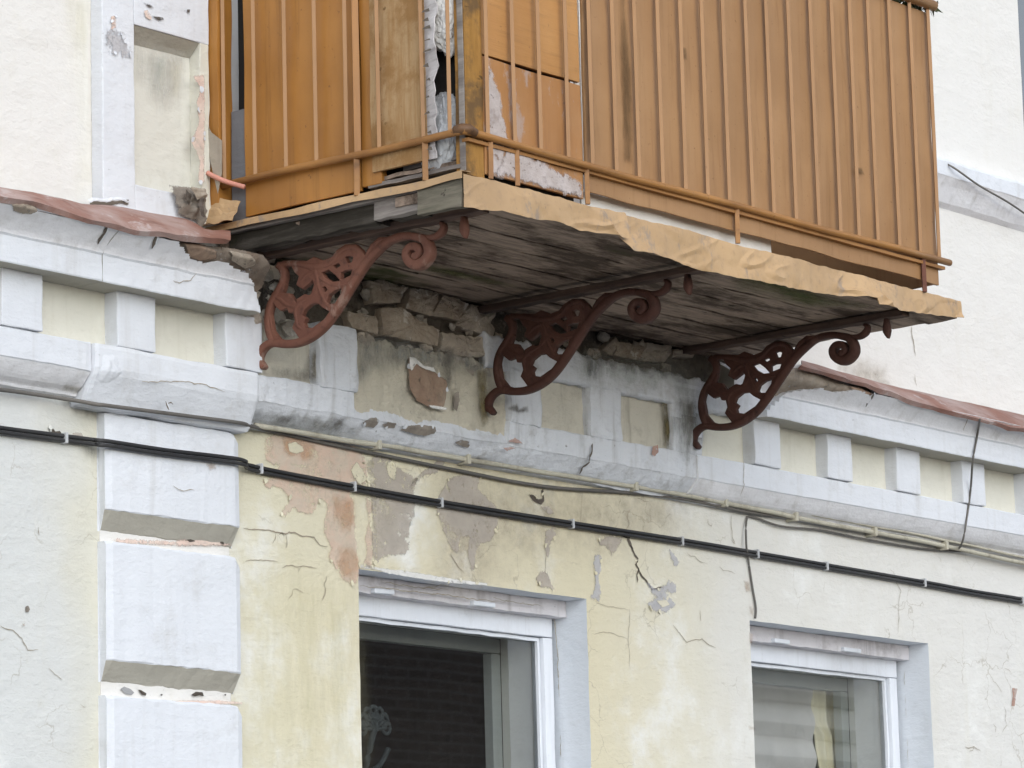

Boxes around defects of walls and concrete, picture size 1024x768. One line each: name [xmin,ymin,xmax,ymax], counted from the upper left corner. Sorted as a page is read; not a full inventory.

peeling [105,15,132,58]
flaking render [175,240,297,338]
flaking render [330,279,506,448]
flaking render [587,331,694,372]
damp [663,367,698,448]
crack [579,444,593,474]
crack [244,528,327,600]
peeling [264,435,498,586]
peeling [536,571,553,589]
peeling [591,535,622,602]
crack [580,503,664,590]
flaking render [177,692,242,704]